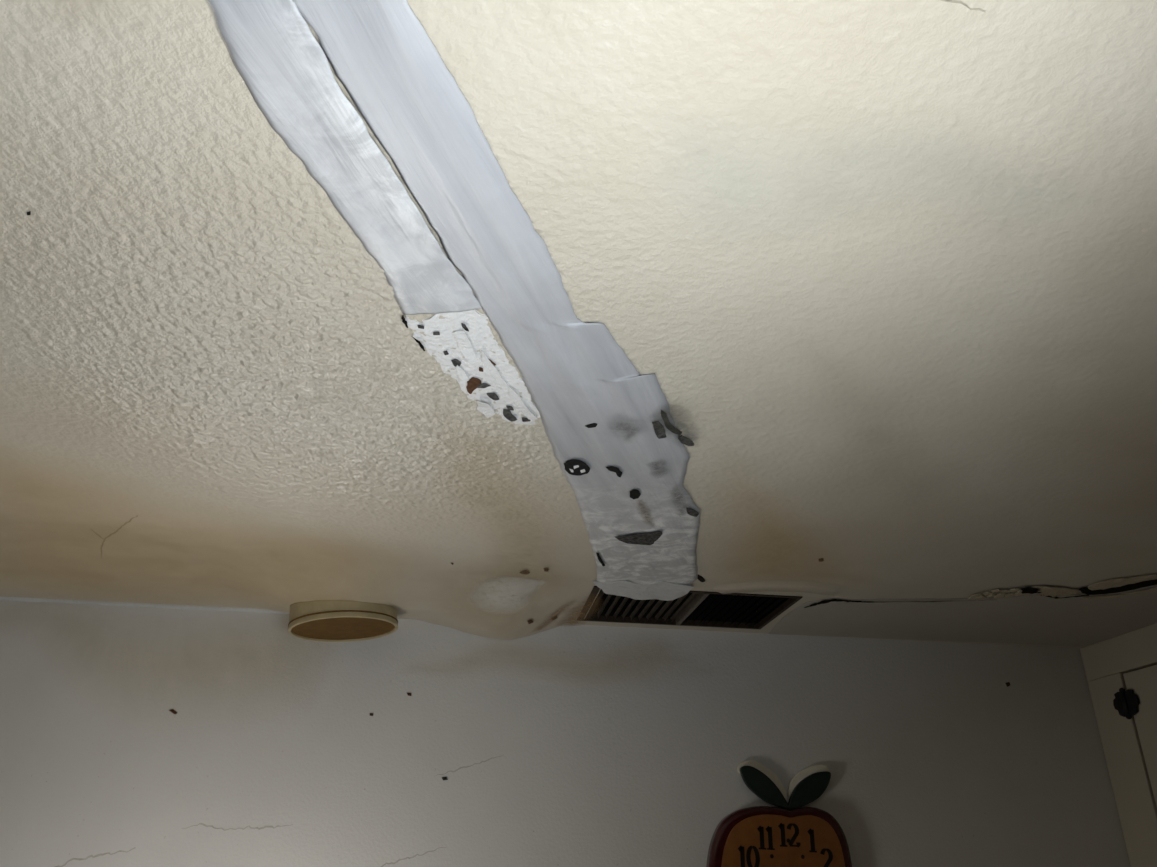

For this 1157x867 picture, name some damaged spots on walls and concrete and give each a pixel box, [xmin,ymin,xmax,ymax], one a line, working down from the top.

peeling [401,310,540,425]
leakage [615,490,662,545]
crack [804,599,983,608]